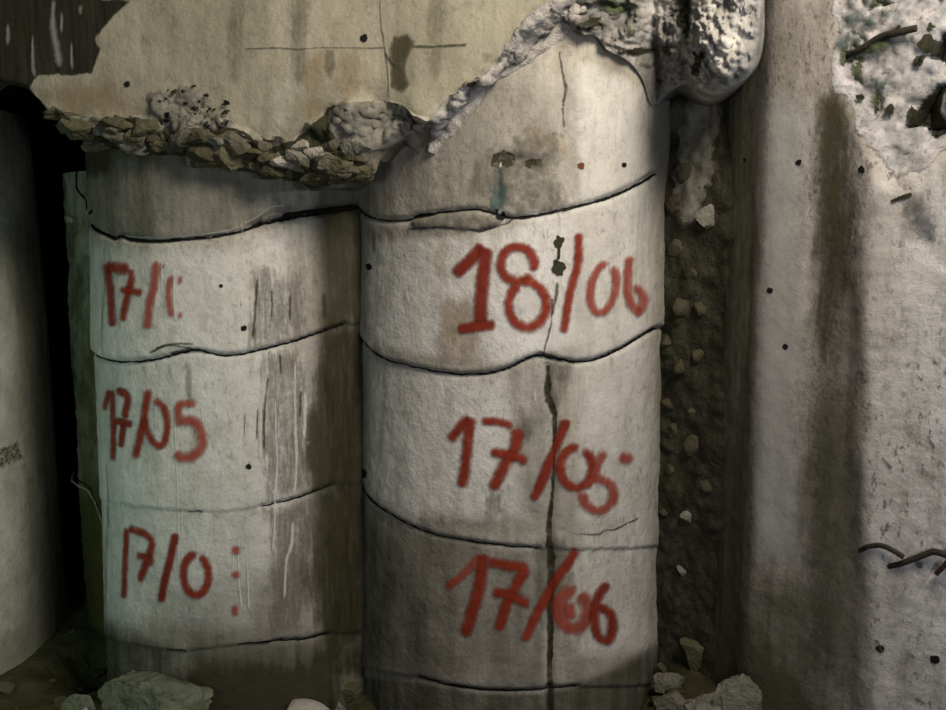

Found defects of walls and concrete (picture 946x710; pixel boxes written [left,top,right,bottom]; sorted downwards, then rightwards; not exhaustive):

spalling [41,85,380,188]
crack [75,172,656,243]
spalling [491,140,561,220]
crack [559,51,567,124]
damp [816,93,848,358]
spalling [830,0,946,178]
damp [0,441,22,468]
crack [96,299,656,710]